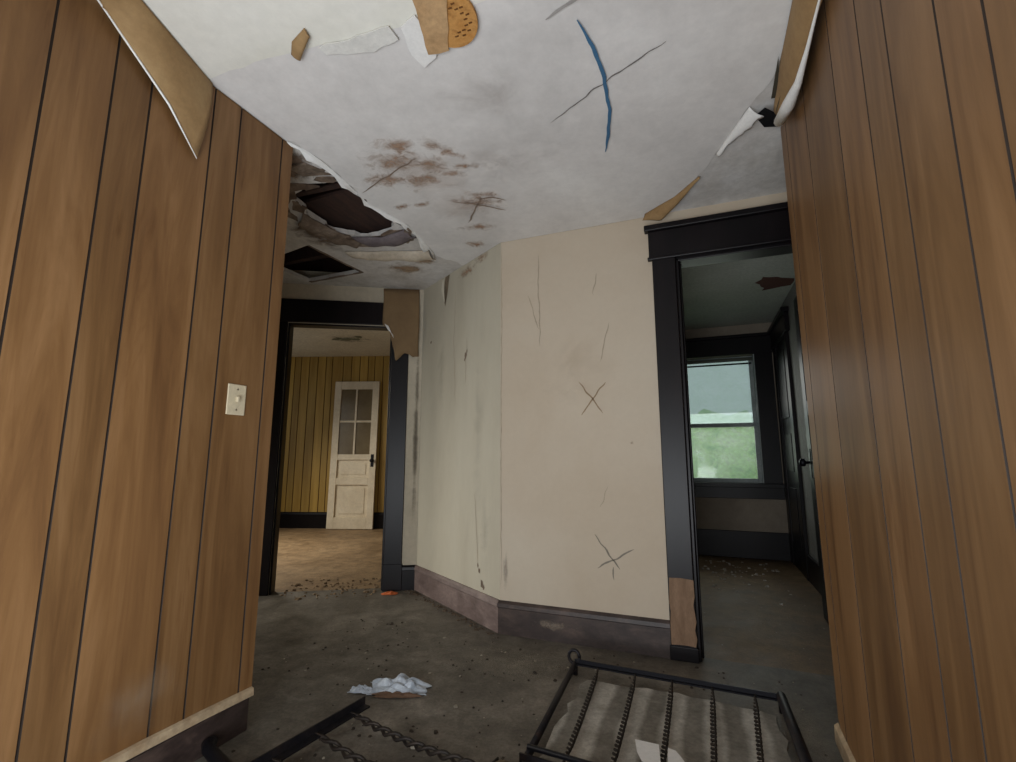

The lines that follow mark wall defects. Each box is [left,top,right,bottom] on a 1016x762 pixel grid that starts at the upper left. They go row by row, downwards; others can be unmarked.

water stain [371,143,407,184]
peeling [288,162,336,230]
water stain [390,260,432,272]